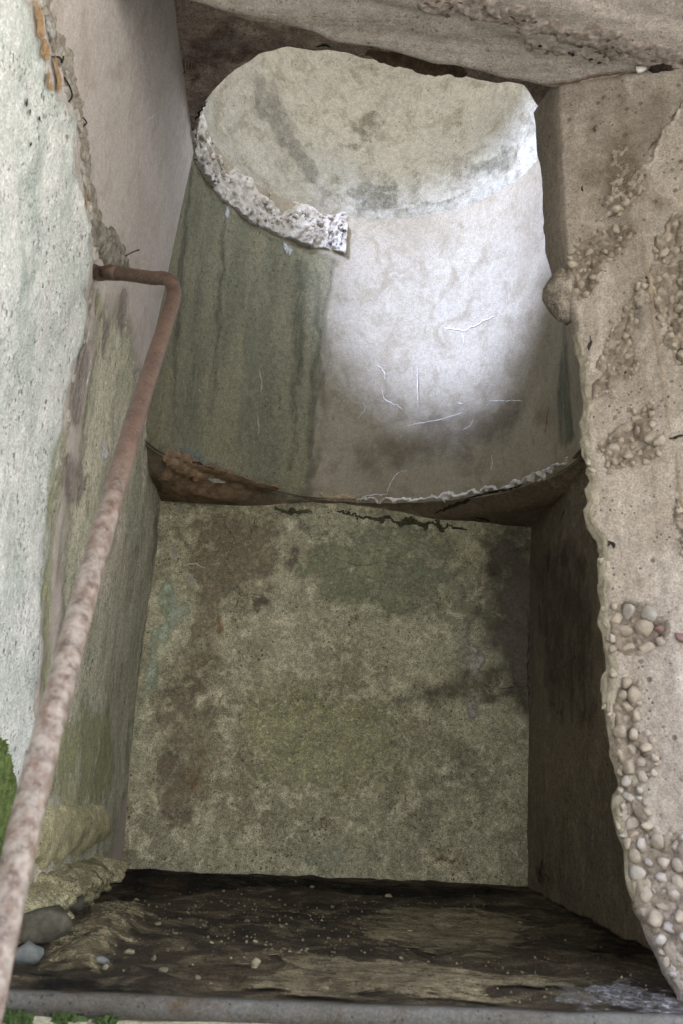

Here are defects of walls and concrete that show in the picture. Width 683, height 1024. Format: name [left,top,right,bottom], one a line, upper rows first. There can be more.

spalling [190,112,348,255]
flaking render [566,192,633,301]
flaking render [634,215,683,315]
peeling [0,0,130,788]
spalling [157,449,281,502]
damp [157,506,312,824]
spalling [573,305,683,980]